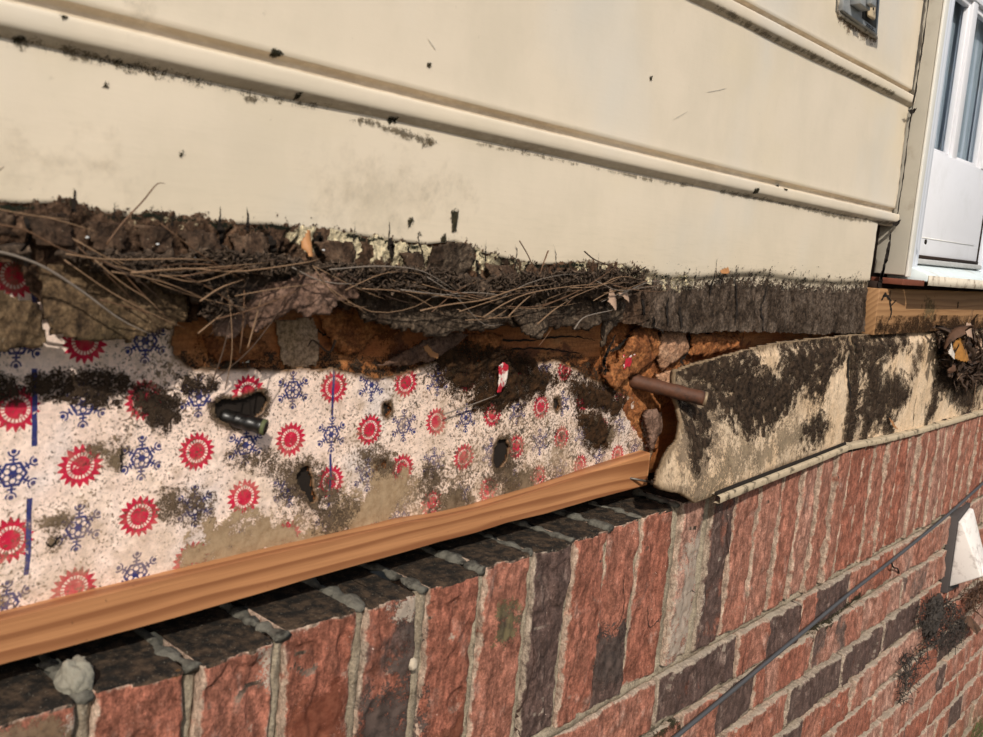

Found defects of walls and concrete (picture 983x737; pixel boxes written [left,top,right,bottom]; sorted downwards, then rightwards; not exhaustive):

damp [11,33,226,92]
damp [241,89,329,108]
damp [354,117,437,149]
peeling [0,211,174,253]
peeling [399,241,475,276]
peeling [202,240,360,364]
peeling [600,299,626,347]
damp [0,329,605,437]
damp [668,298,983,500]
peeling [176,462,422,569]
peeling [433,483,480,512]
peeling [503,465,541,494]